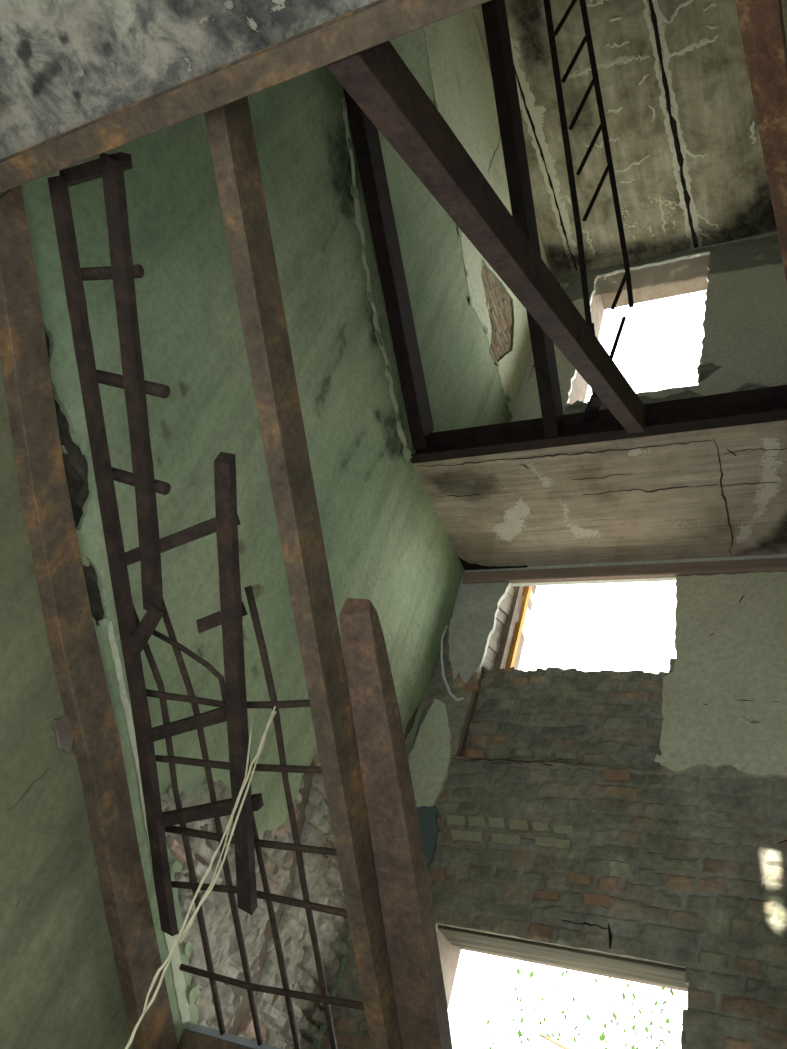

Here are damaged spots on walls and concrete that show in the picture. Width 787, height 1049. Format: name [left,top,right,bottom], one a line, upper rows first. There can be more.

peeling [423,8,512,215]
crack [568,0,721,249]
crack [749,121,757,144]
peeling [458,227,532,420]
peeling [537,227,551,271]
leakage [556,142,783,301]
spalling [53,393,110,629]
leakage [490,498,531,542]
crack [421,439,787,554]
leakage [734,437,787,553]
flaking render [161,749,351,1049]
crack [563,920,612,949]